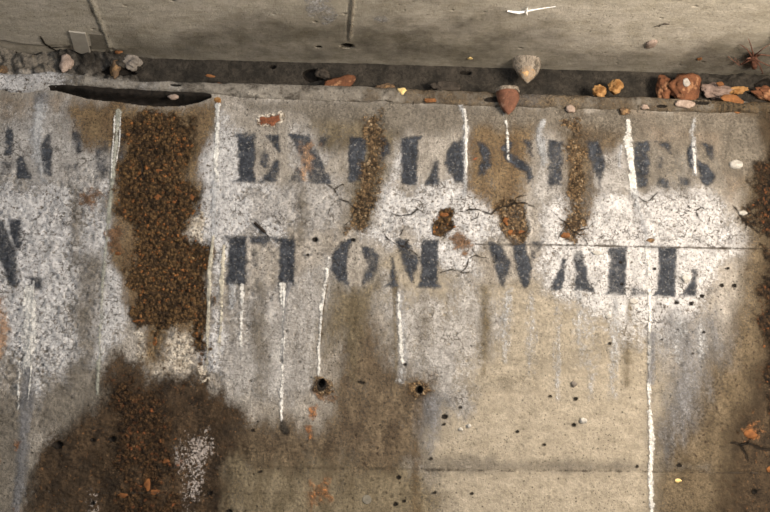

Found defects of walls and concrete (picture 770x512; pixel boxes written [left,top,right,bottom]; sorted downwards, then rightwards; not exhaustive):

rust [256,111,285,127]
crack [328,184,424,258]
crack [440,249,487,273]
water stain [0,93,528,512]
water stain [247,101,770,512]